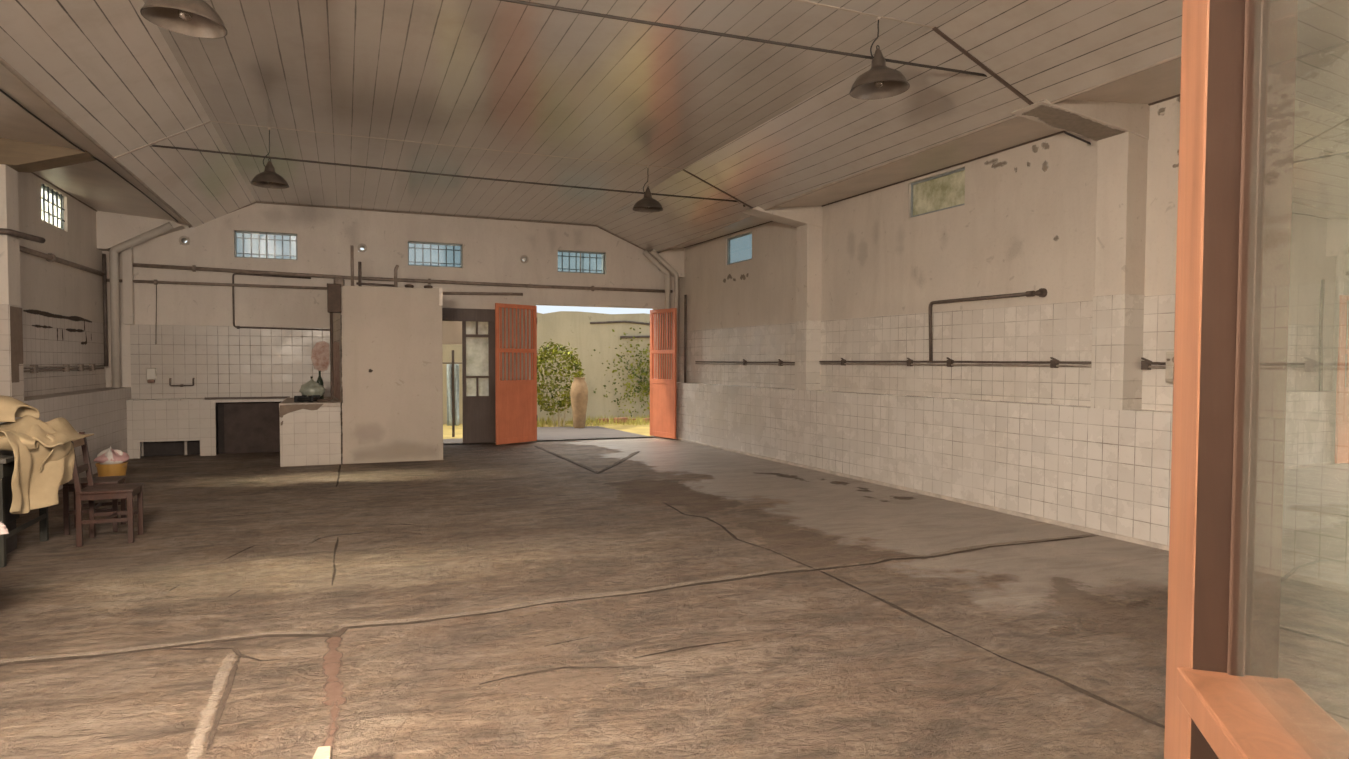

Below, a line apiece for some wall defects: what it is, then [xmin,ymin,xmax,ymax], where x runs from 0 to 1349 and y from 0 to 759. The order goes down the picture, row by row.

crack [0,502,1165,728]